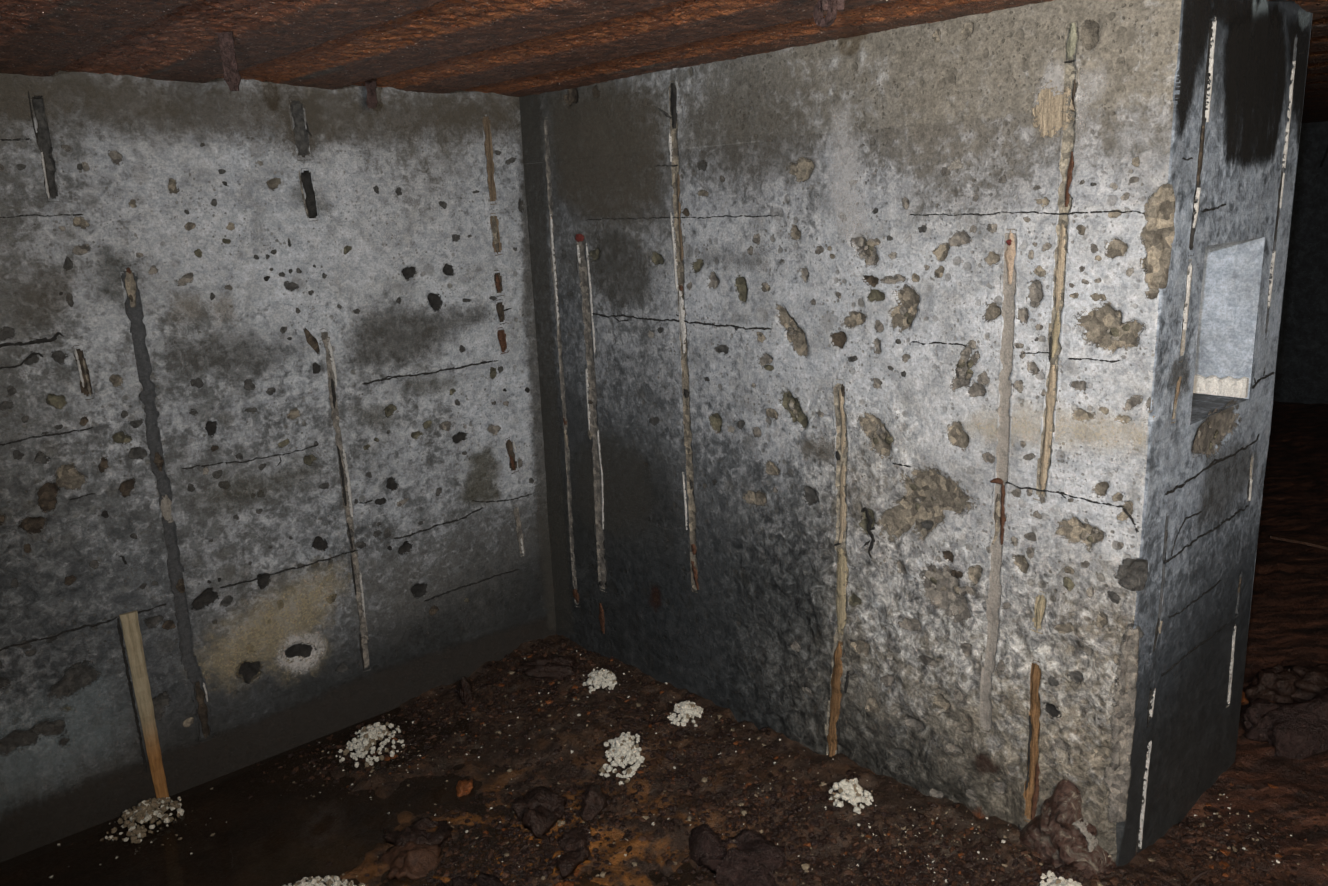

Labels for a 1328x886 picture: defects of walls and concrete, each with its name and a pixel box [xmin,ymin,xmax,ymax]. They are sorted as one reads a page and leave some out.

flaking render [1031,79,1075,138]
damp [1175,0,1310,167]
crack [910,209,1145,217]
spalling [1069,184,1175,353]
crack [0,332,64,369]
corrosion [495,275,505,350]
crack [592,313,772,330]
damp [0,74,572,863]
spalling [858,412,894,460]
spalling [858,466,975,543]
crack [1164,434,1259,564]
spalling [896,551,982,625]